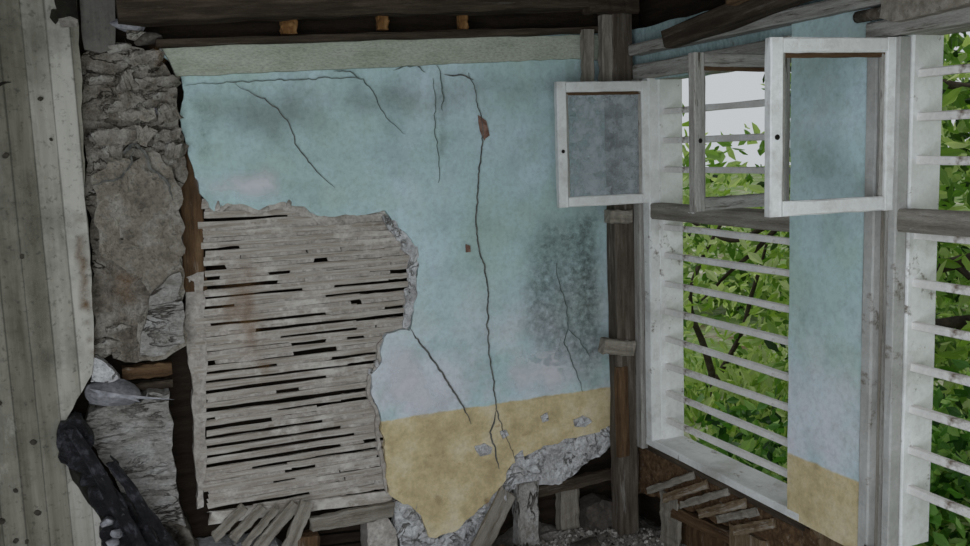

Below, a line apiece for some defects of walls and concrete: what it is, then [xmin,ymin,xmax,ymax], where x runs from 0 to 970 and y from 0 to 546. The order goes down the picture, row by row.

flaking render [91,354,120,383]
crack [186,70,404,188]
flaking render [189,199,610,546]
crack [393,66,515,468]